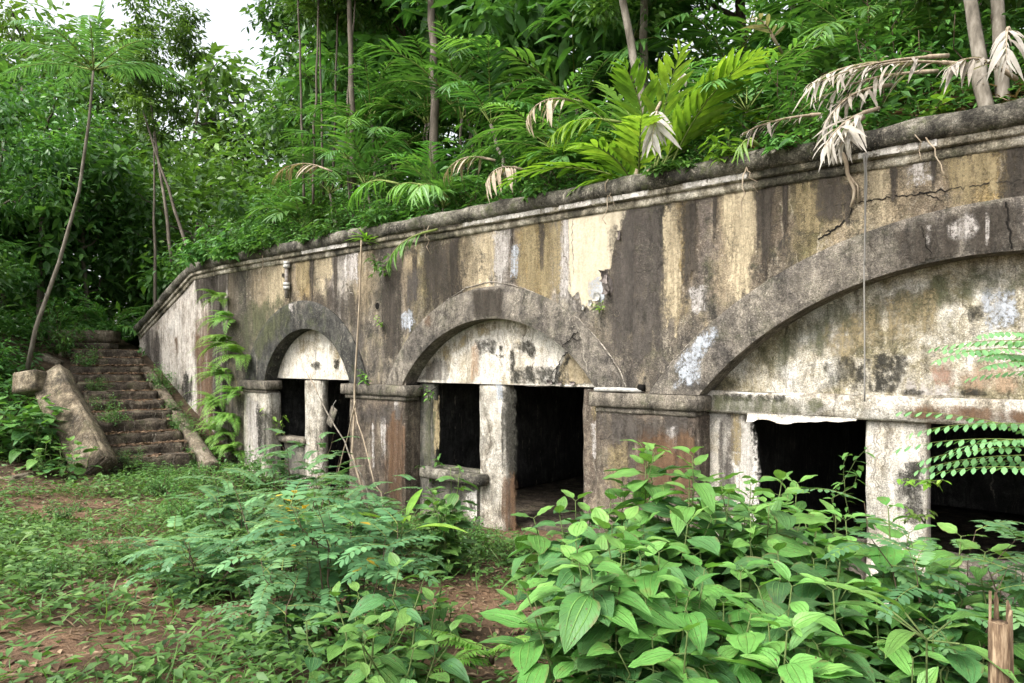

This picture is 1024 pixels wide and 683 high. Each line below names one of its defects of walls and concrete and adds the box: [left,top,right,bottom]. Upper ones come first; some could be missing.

flaking render [463,191,648,310]
leakage [575,201,705,387]
leakage [712,175,852,300]
leakage [770,275,959,396]
crack [818,180,1017,249]
leakage [961,269,1024,322]
rust [385,411,405,506]